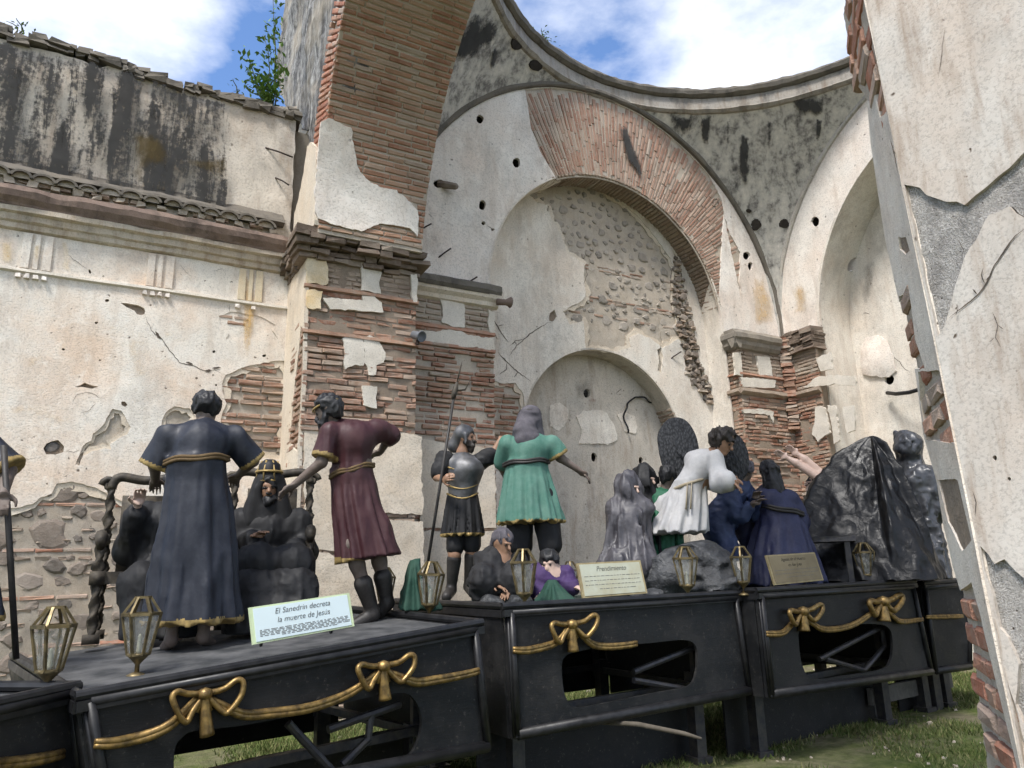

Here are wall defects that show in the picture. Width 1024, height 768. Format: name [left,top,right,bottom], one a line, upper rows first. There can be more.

leakage [456,14,498,67]
leakage [0,42,228,207]
flaking render [314,118,419,237]
leakage [740,135,749,183]
leakage [794,98,823,139]
crack [145,316,221,372]
flaking render [215,312,284,459]
flaking render [342,335,386,409]
crack [495,322,546,381]
flaking render [530,185,714,404]
crack [949,229,1024,347]
flaking render [0,482,143,681]